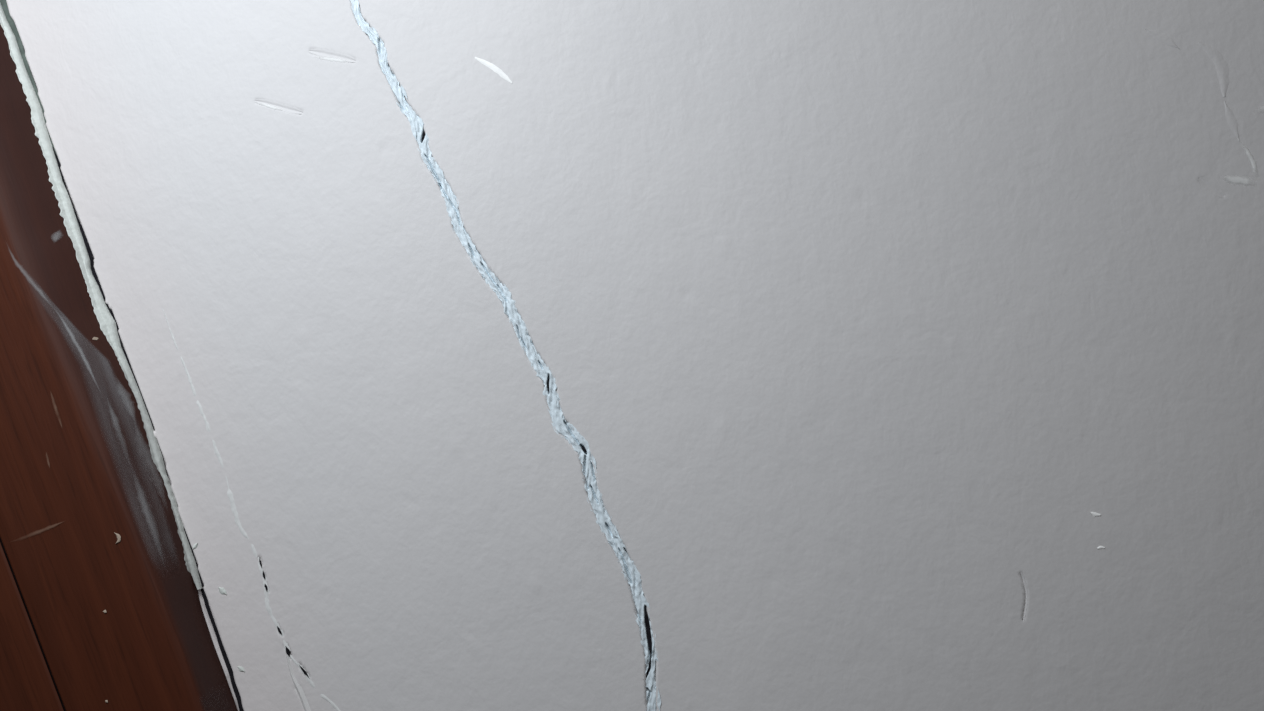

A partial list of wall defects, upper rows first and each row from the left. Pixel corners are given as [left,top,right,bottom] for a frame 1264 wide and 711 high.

crack [0,0,245,711]
crack [162,309,341,711]
crack [349,0,661,711]